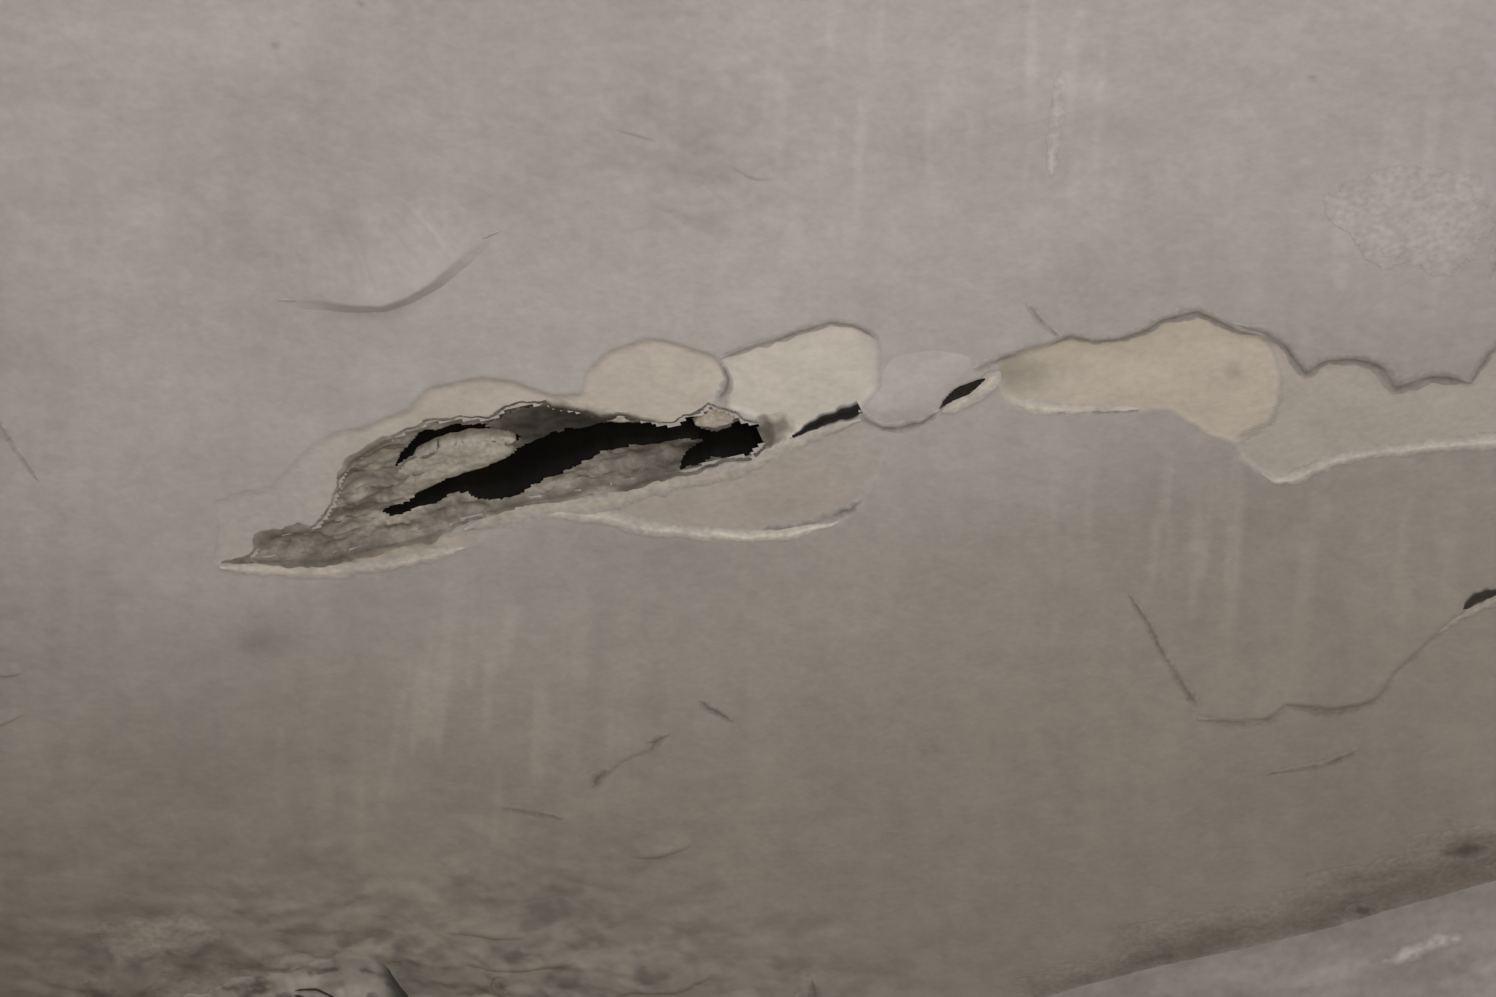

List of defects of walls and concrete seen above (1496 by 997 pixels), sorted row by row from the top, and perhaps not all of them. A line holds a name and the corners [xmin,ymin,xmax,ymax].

spalling [213,319,970,580]
spalling [994,305,1496,485]
damp [75,951,335,997]